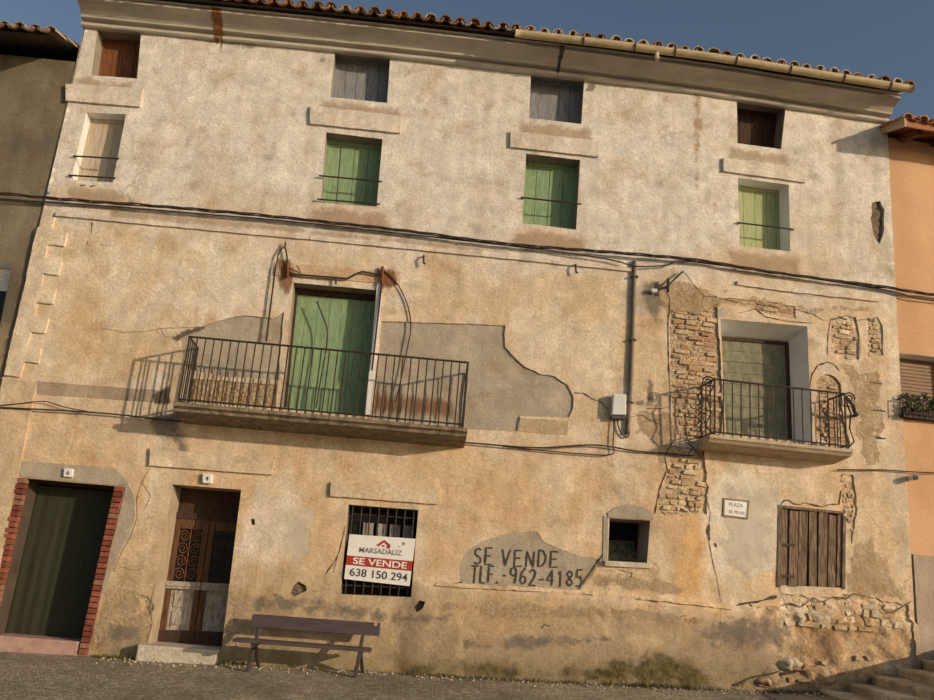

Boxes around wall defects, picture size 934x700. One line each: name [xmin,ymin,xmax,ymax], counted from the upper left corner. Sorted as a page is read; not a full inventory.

corrosion [211,7,224,49]
crack [104,327,197,338]
corrosion [378,268,397,287]
flaking render [372,321,574,431]
crack [631,289,854,607]
flaking render [636,281,885,516]
crack [683,271,873,407]
flaking render [727,474,918,694]